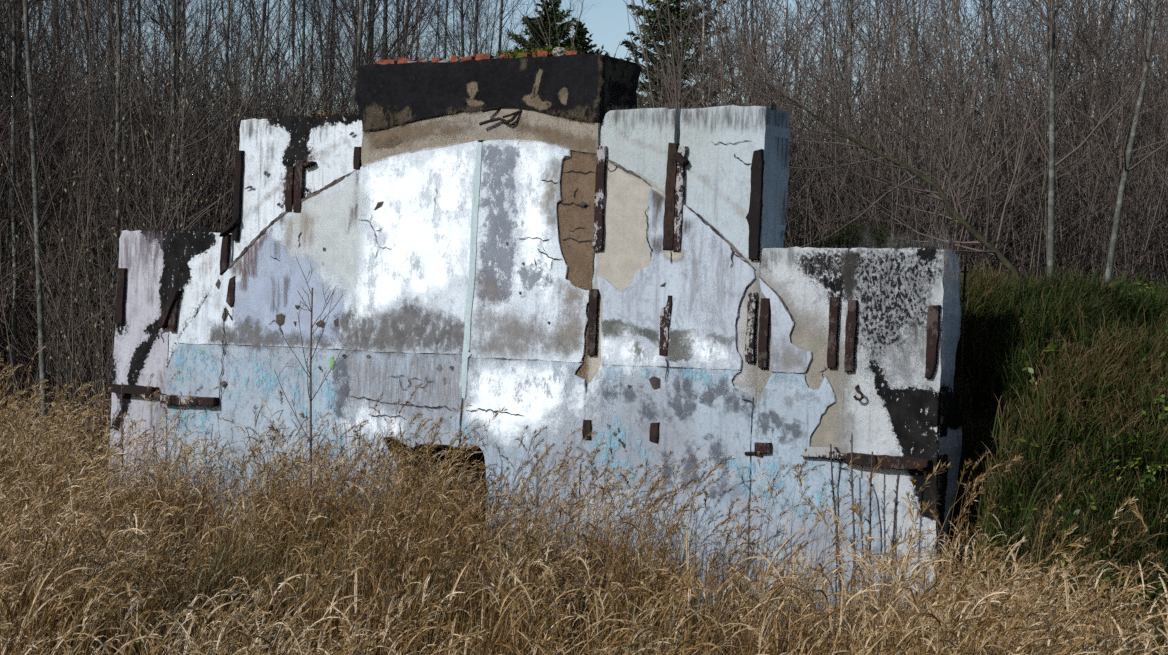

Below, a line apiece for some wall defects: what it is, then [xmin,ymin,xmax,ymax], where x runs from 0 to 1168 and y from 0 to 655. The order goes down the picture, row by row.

water stain [110,228,216,431]
peeling [221,103,683,569]
water stain [601,319,735,365]
water stain [601,385,654,419]
water stain [668,377,800,443]
flaking render [684,259,848,514]
water stain [789,240,964,527]
water stain [658,447,701,490]
water stain [703,435,728,466]